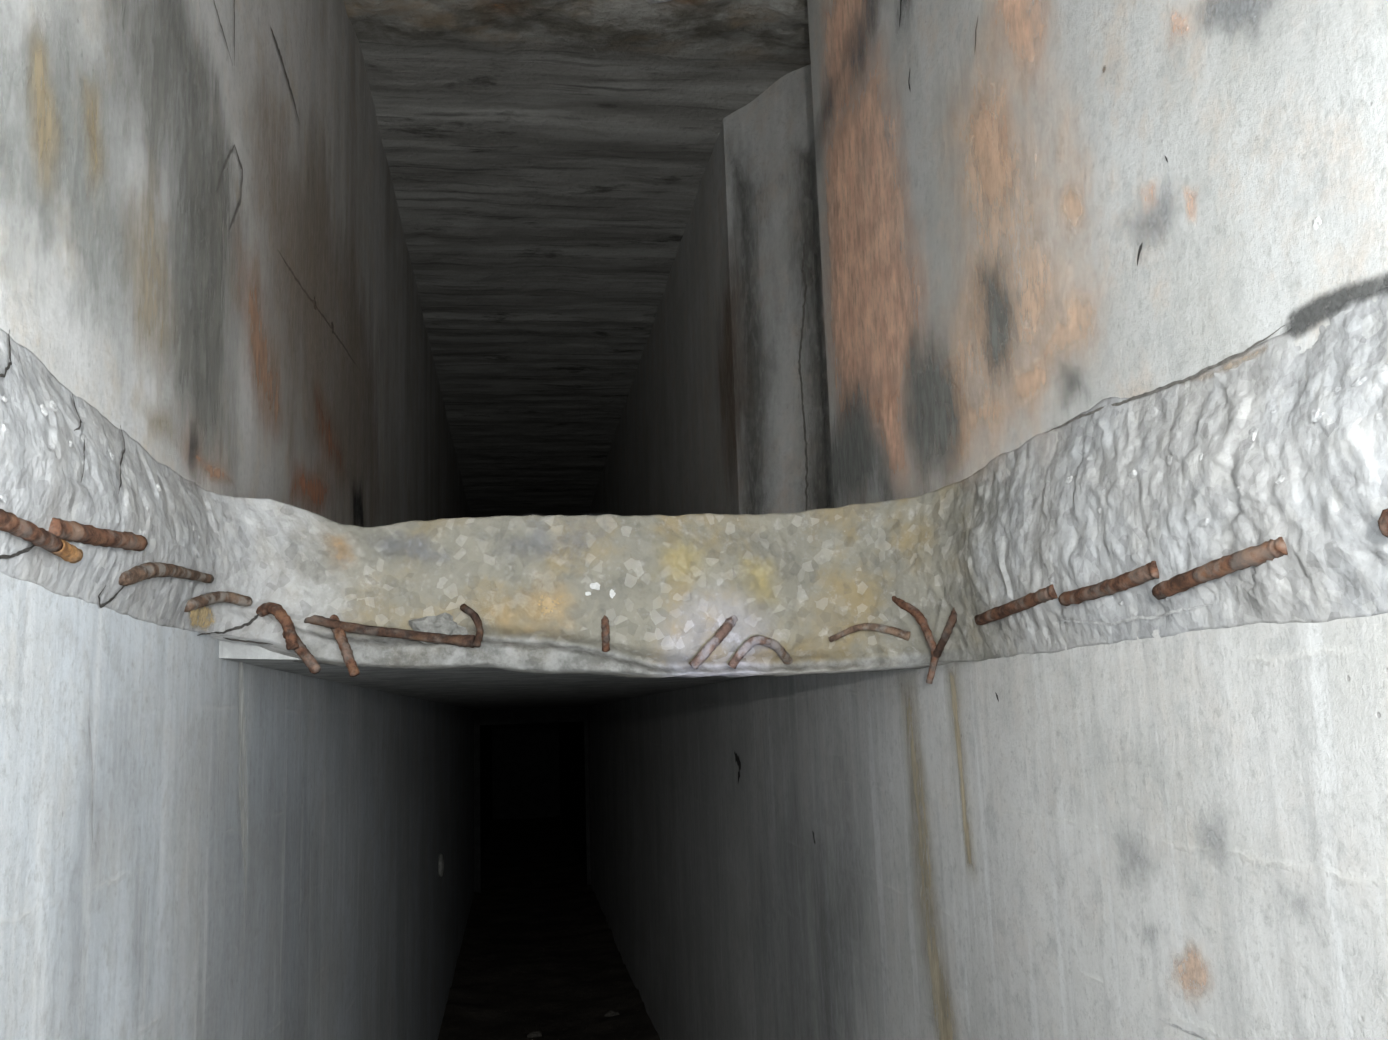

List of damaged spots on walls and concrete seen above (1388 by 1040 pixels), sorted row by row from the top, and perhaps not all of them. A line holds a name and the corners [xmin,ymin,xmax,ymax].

damp [0,49,123,295]
damp [113,0,232,464]
corrosion [826,0,913,466]
corrosion [248,287,279,420]
damp [908,344,959,474]
damp [986,274,1009,364]
damp [1287,274,1388,335]
damp [353,493,364,527]
spalling [0,289,1388,684]